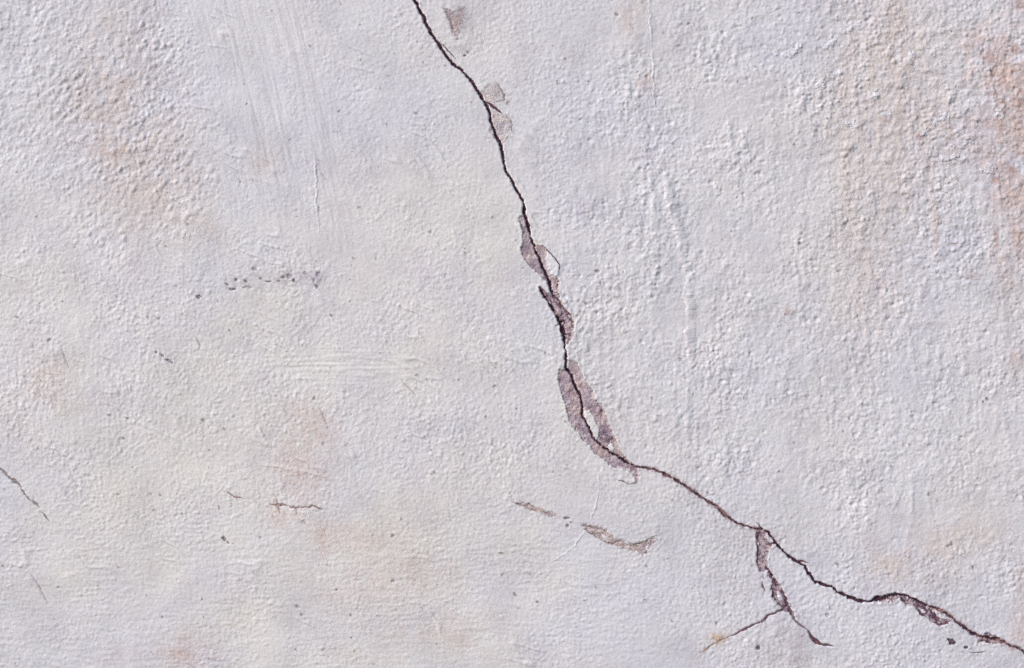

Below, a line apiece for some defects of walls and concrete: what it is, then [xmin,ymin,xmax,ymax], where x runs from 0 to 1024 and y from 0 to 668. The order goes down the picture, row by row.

peeling [480,82,512,144]
flaking render [519,215,575,345]
crack [413,0,1024,653]
flaking render [558,360,640,484]
crack [0,468,49,521]
peeling [512,502,655,556]